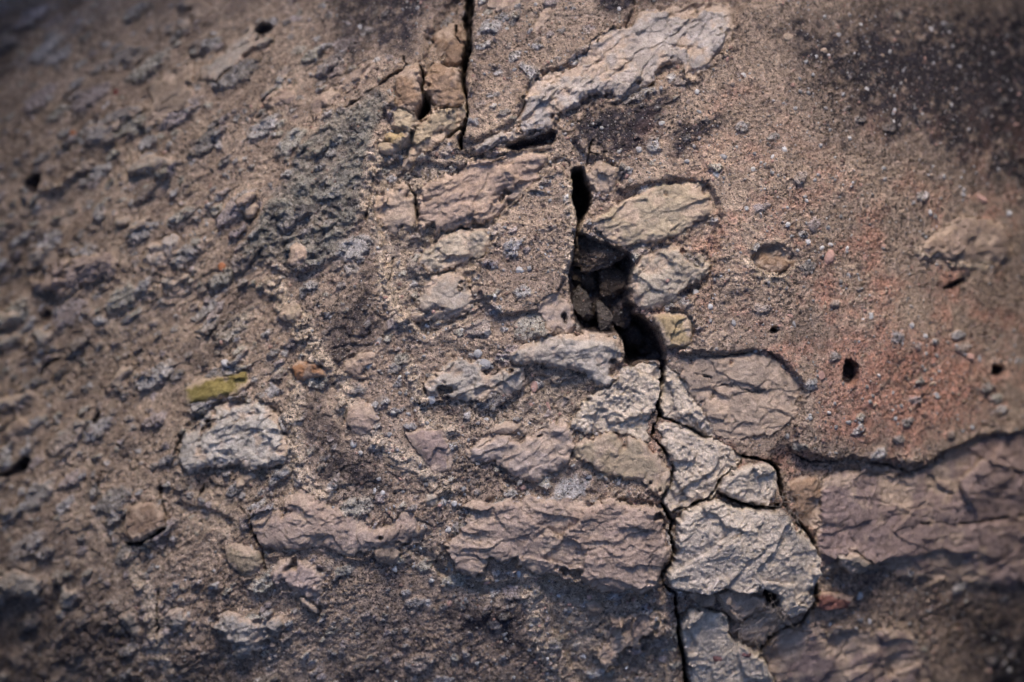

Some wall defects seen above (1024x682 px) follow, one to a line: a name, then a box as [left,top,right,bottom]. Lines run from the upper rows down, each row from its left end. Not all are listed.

crack [455,0,476,99]
crack [449,124,467,150]
crack [701,349,794,382]
crack [655,357,683,425]
crack [864,461,927,472]
crack [958,516,1014,525]
crack [660,443,839,682]